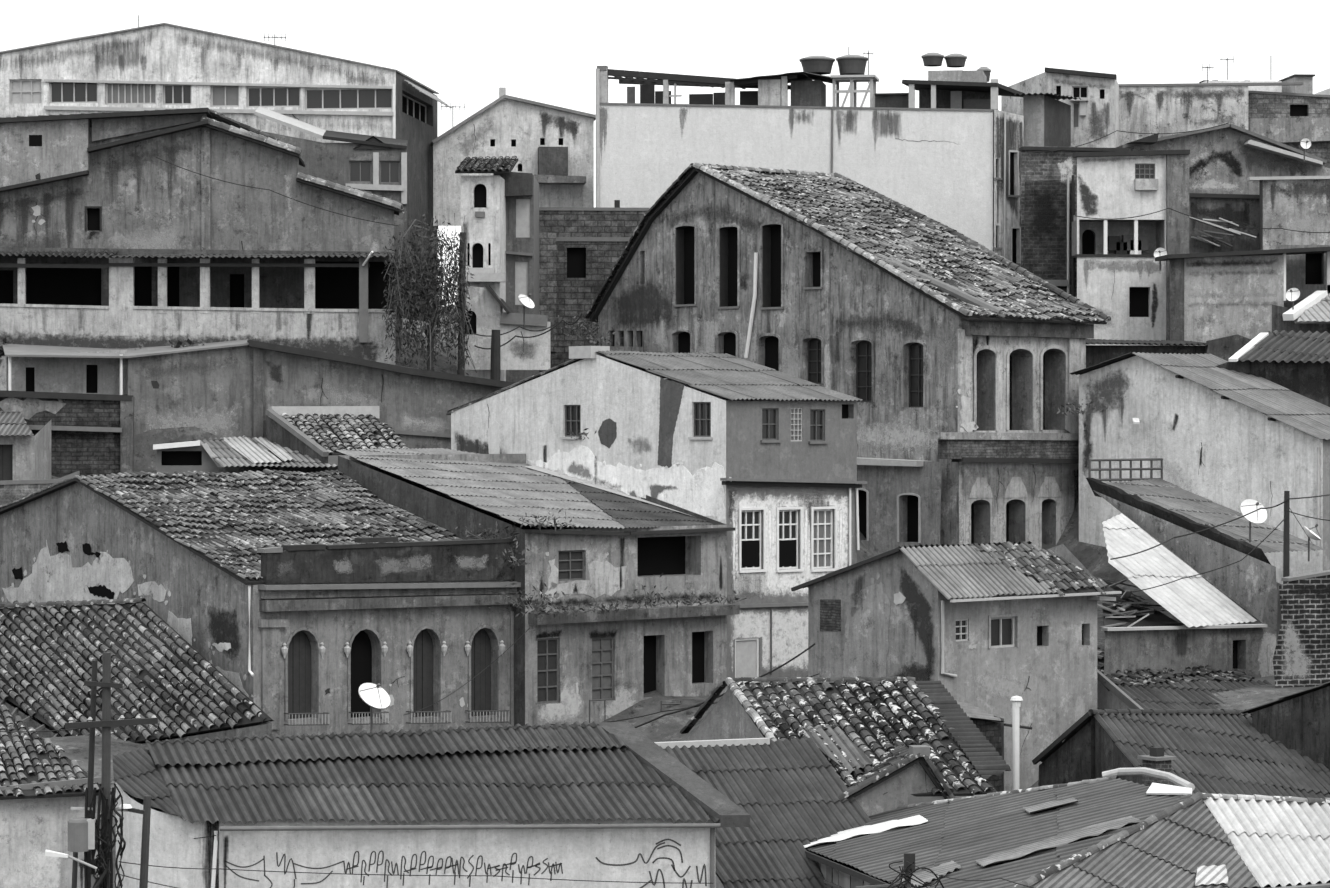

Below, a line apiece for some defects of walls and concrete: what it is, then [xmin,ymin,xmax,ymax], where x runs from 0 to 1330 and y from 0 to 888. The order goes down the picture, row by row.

damp [789,109,813,129]
damp [837,110,856,140]
damp [873,111,900,140]
peeling [527,445,732,522]
peeling [1,540,253,697]